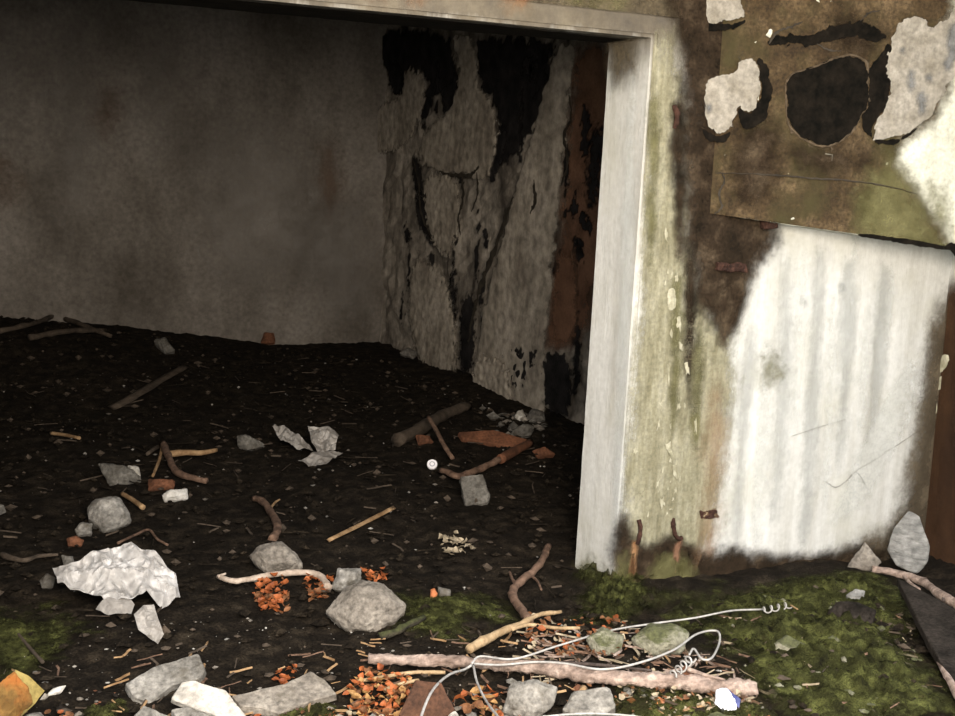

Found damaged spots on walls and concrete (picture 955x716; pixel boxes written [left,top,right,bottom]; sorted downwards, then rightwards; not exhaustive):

peeling [706,0,746,31]
peeling [702,58,773,143]
peeling [785,10,955,151]
leakage [521,0,955,440]
rust [699,509,719,519]